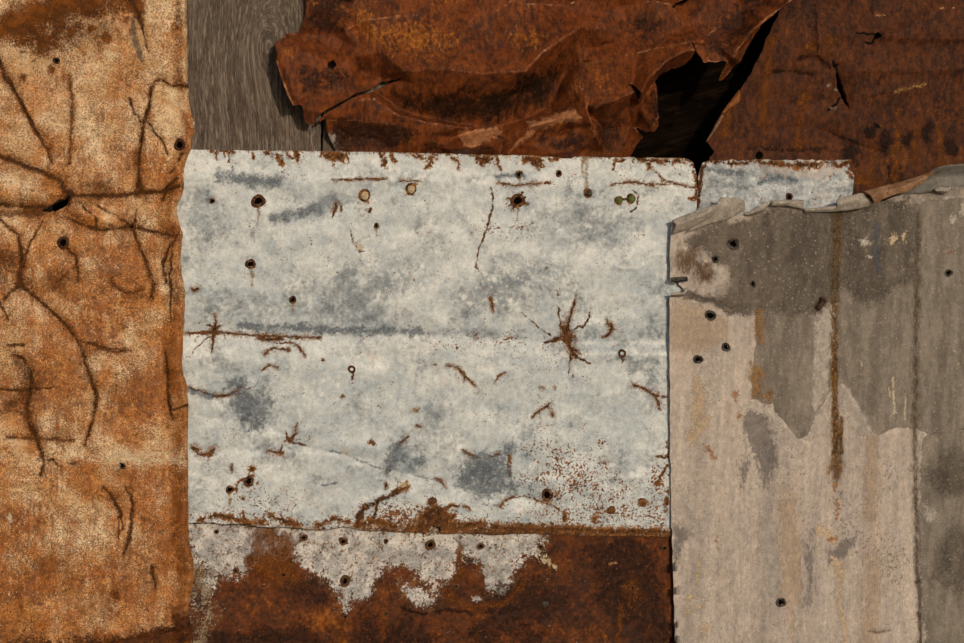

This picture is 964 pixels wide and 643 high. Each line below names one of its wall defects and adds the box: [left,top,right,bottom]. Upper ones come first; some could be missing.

corrosion [9,76,122,233]
corrosion [0,0,146,73]
corrosion [251,150,304,167]
corrosion [298,65,350,97]
corrosion [314,120,418,213]
corrosion [403,0,964,216]
crack [827,60,849,112]
corrosion [0,226,128,458]
corrosion [522,299,591,374]
corrosion [814,211,844,520]
corrosion [7,440,676,643]
peeling [188,522,557,643]